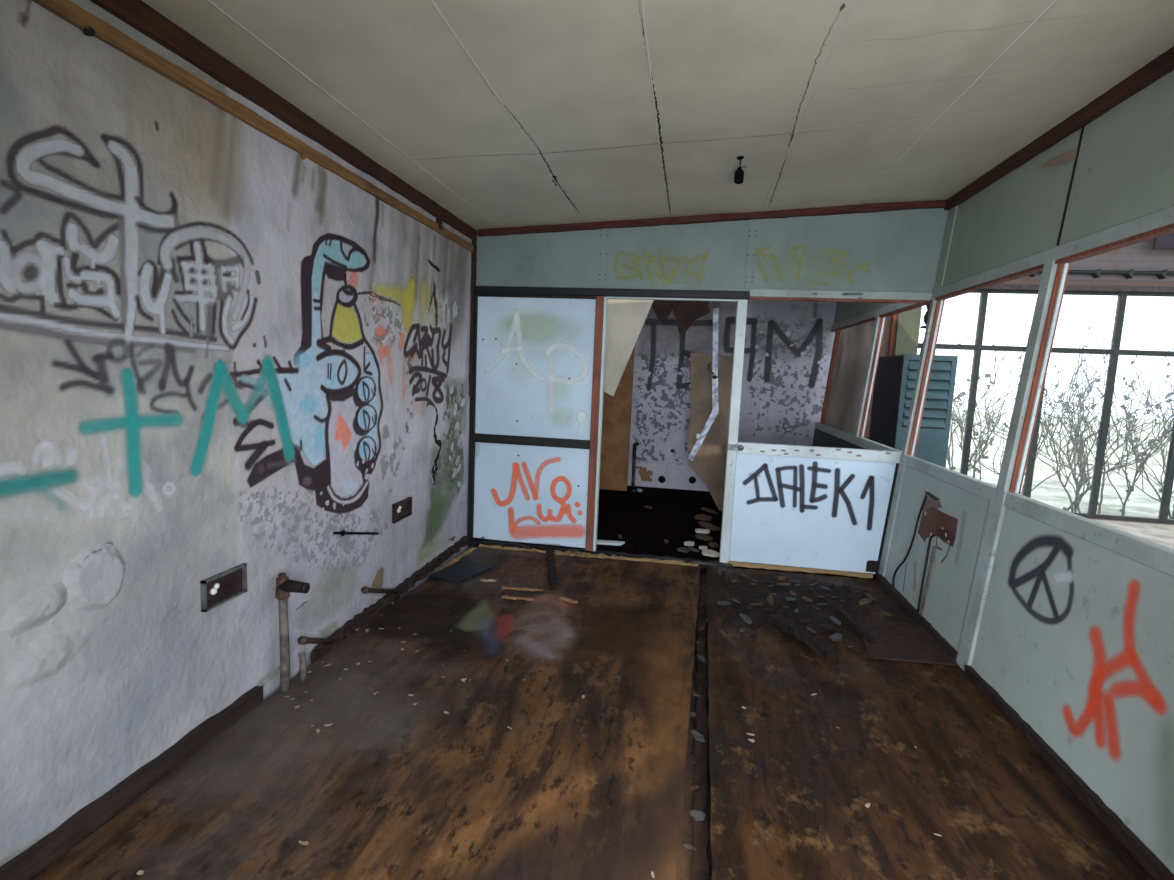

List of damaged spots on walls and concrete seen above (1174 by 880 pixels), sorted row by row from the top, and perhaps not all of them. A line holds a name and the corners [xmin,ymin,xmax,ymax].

crack [421,2,845,215]
peeling [634,353,691,483]